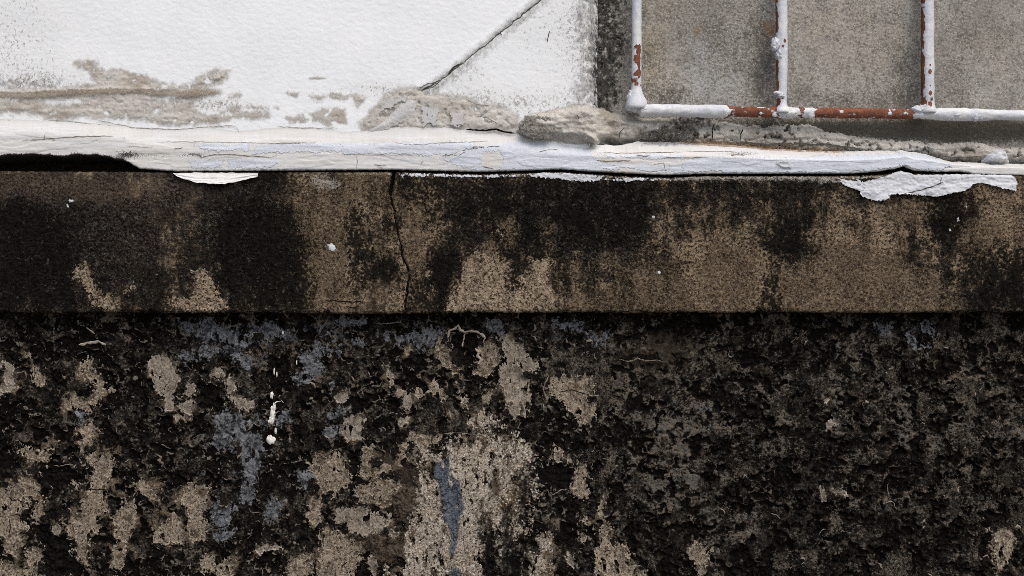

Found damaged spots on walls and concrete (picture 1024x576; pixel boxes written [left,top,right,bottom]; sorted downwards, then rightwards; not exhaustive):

crack [421,0,541,91]
rust [631,44,641,86]
rust [724,60,781,119]
rust [798,0,927,120]
leakage [205,194,318,314]
leakage [340,172,655,314]
crack [32,99,981,316]
peeling [173,140,1017,201]
leakage [755,211,819,313]
leakage [920,193,1024,313]
leakage [456,386,508,432]
leakage [469,457,557,576]